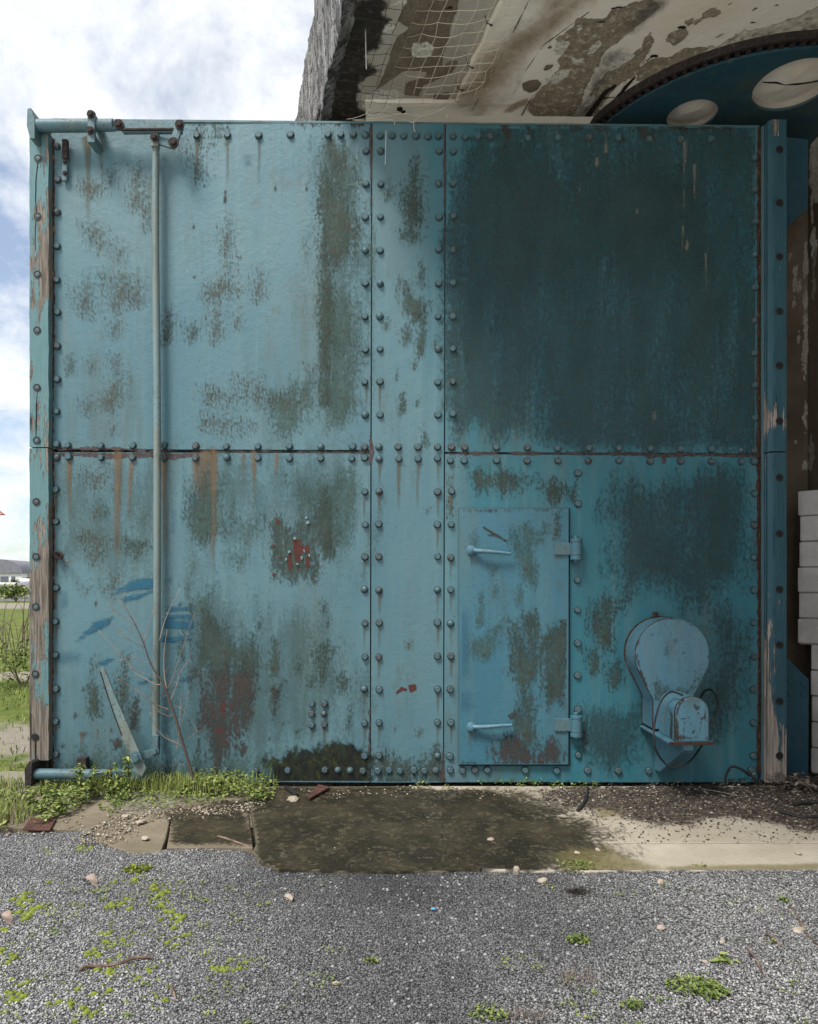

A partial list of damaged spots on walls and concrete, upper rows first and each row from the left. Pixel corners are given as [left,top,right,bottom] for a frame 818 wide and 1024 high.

spalling [501,0,733,149]
crack [763,78,818,86]
rust [67,453,132,521]
rust [187,661,258,772]
rust [486,731,568,764]
leakage [58,744,630,871]